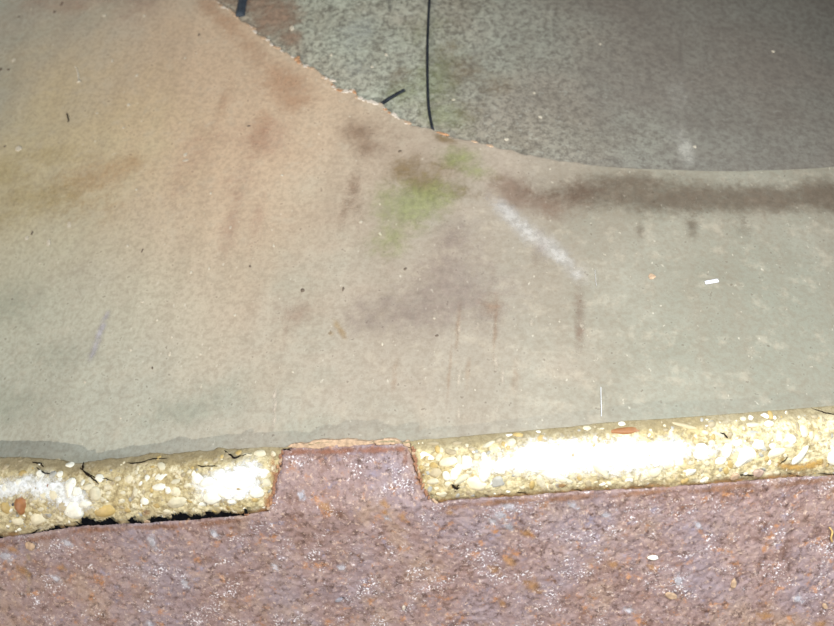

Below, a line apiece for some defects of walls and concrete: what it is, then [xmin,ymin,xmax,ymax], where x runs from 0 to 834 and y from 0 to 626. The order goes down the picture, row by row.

spalling [321,76,412,125]
rust [202,437,465,525]
rust [479,484,610,505]
rust [623,483,666,496]
rust [687,461,831,492]